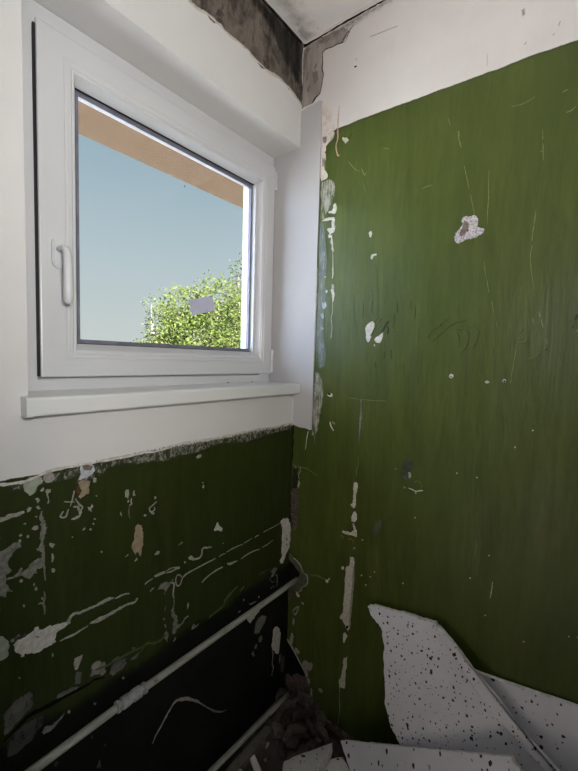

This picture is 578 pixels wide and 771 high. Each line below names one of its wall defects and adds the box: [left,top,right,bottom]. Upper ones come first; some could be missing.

crack [262,0,385,109]
peeling [314,103,353,362]
spalling [454,215,484,244]
peeling [305,372,323,449]
peeling [0,423,292,615]
spalling [259,468,330,695]
peeling [340,459,359,643]
flaking render [0,622,68,661]
flaking render [3,691,70,758]
flaking render [57,646,145,699]
spalling [238,596,267,657]
peeling [337,656,348,726]